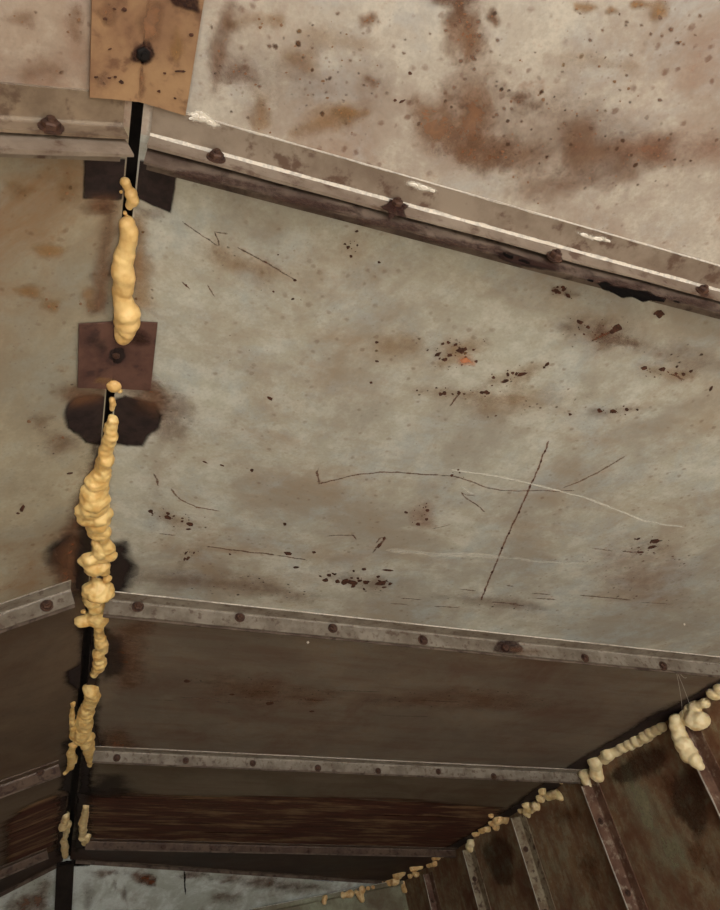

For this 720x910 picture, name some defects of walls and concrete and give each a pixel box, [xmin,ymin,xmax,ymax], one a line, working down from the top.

rust [632,1,666,19]
rust [434,0,499,70]
rust [413,73,523,168]
rust [176,171,576,272]
rust [563,318,628,343]
rust [427,338,485,370]
rust [641,354,693,381]
rust [57,518,91,592]
rust [319,568,393,591]